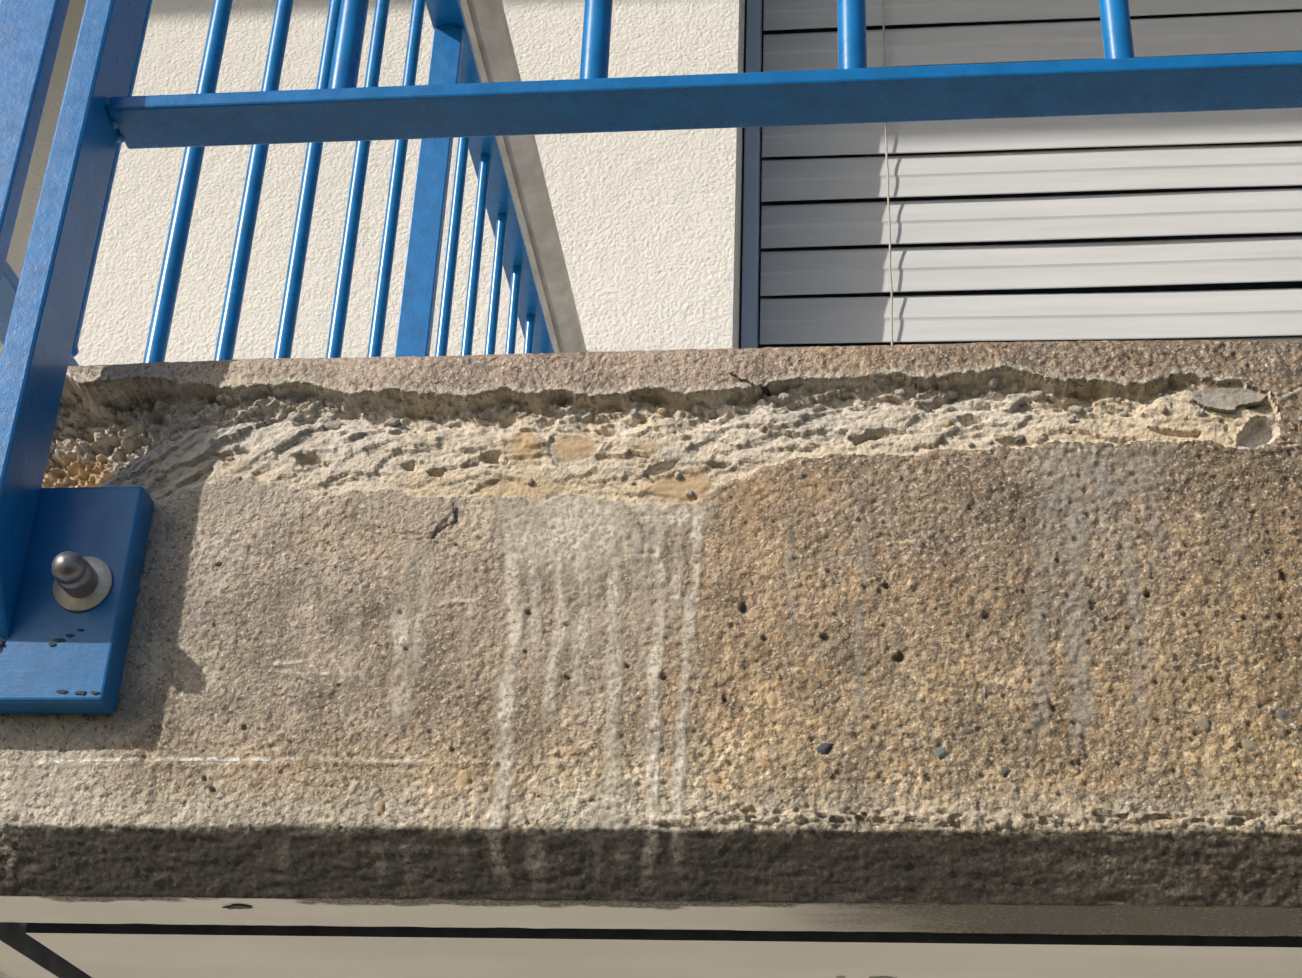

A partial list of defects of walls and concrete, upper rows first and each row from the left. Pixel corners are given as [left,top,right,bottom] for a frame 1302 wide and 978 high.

spalling [42,366,1281,506]
damp [485,496,708,830]